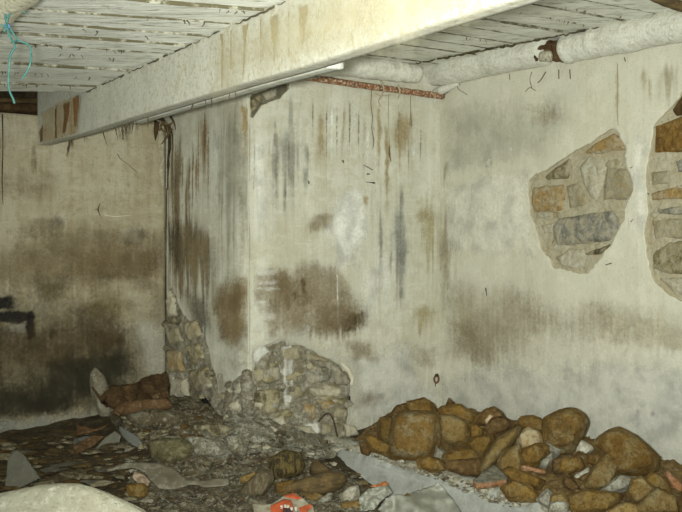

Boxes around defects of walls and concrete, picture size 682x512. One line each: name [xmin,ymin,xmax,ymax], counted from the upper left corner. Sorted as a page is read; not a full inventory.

water stain [0,230,161,288]
water stain [169,115,216,331]
flaking render [250,84,287,118]
water stain [313,190,367,264]
water stain [349,108,410,187]
water stain [369,197,406,304]
flaking render [531,129,633,274]
flaking render [647,97,682,301]
water stain [0,297,125,428]
water stain [214,265,430,420]
flaking render [161,288,505,500]